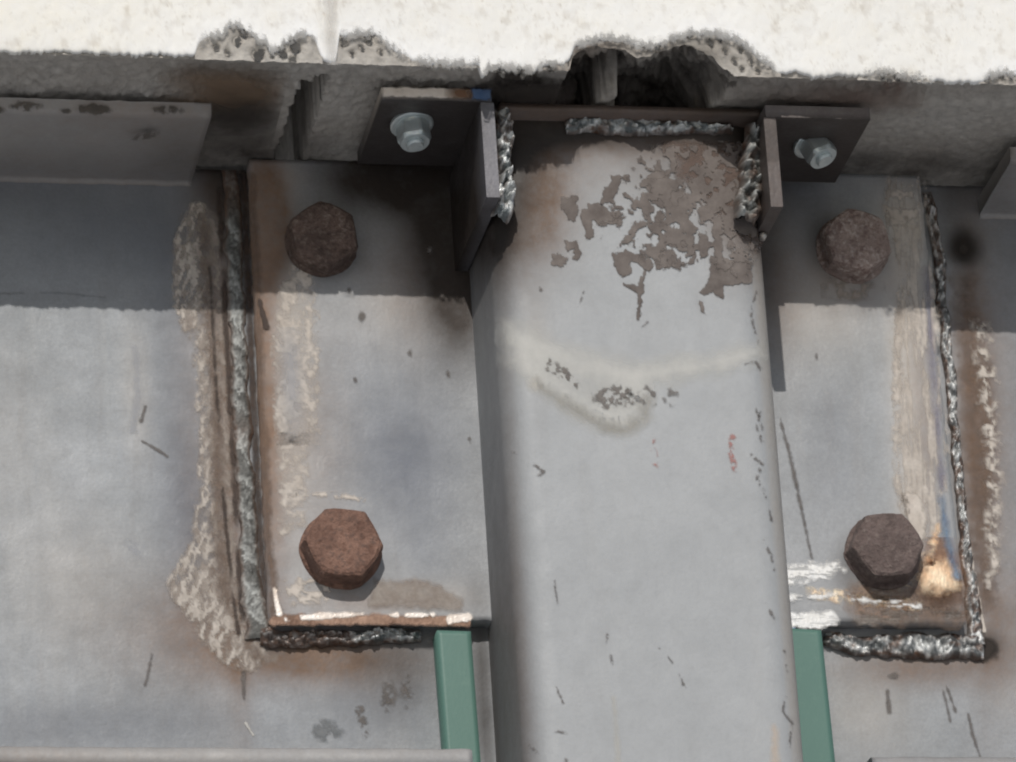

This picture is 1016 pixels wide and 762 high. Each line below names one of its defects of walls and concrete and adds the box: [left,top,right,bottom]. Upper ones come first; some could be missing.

spalling [337,27,781,79]
peeling [551,141,762,320]